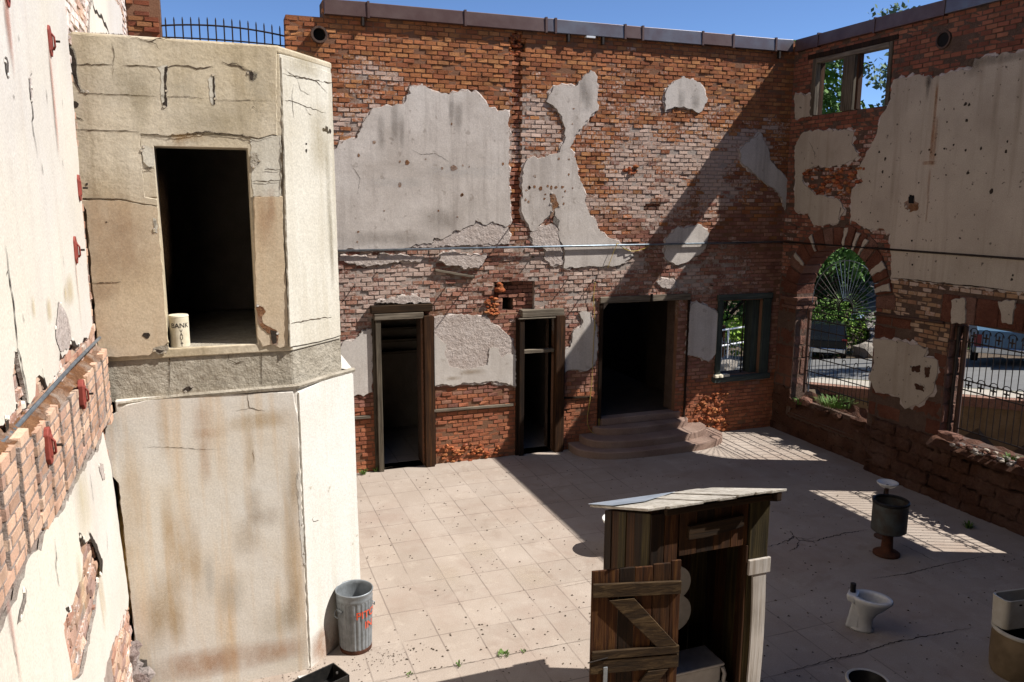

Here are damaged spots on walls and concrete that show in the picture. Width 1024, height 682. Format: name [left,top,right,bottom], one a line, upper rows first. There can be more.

crack [14,5,333,196]
peeling [662,76,708,114]
spalling [802,151,890,196]
peeling [656,224,709,291]
spalling [55,302,80,352]
spalling [5,352,26,431]
spalling [436,443,505,463]
spalling [18,587,27,623]
spalling [63,532,103,679]